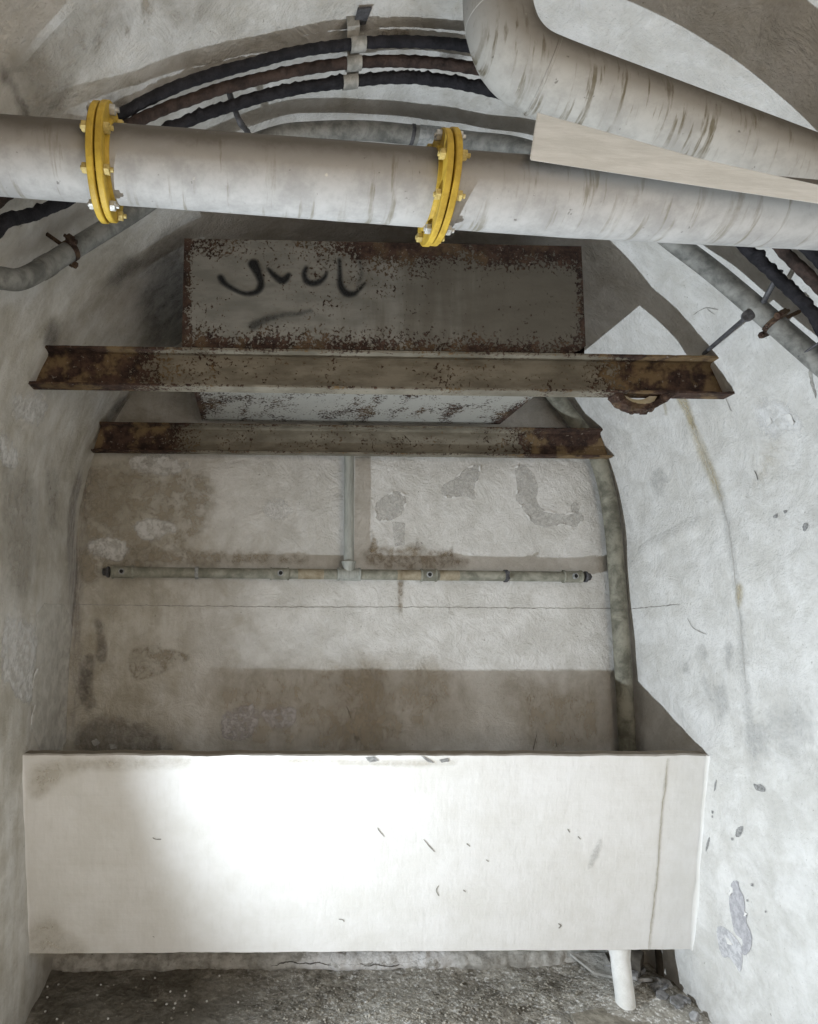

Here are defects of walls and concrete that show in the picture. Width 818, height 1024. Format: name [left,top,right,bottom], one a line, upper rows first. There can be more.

corrosion [612,393,694,430]
peeling [716,881,753,972]